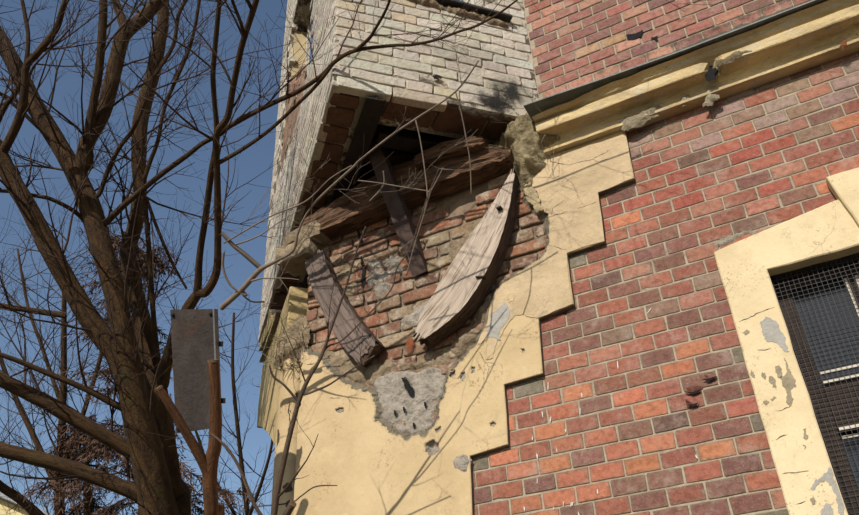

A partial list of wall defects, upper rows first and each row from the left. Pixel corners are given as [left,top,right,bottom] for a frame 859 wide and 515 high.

spalling [626,30,658,41]
flaking render [304,106,662,455]
peeling [750,316,796,407]
spalling [685,375,717,408]
flaking render [453,454,472,472]
peeling [810,467,844,515]